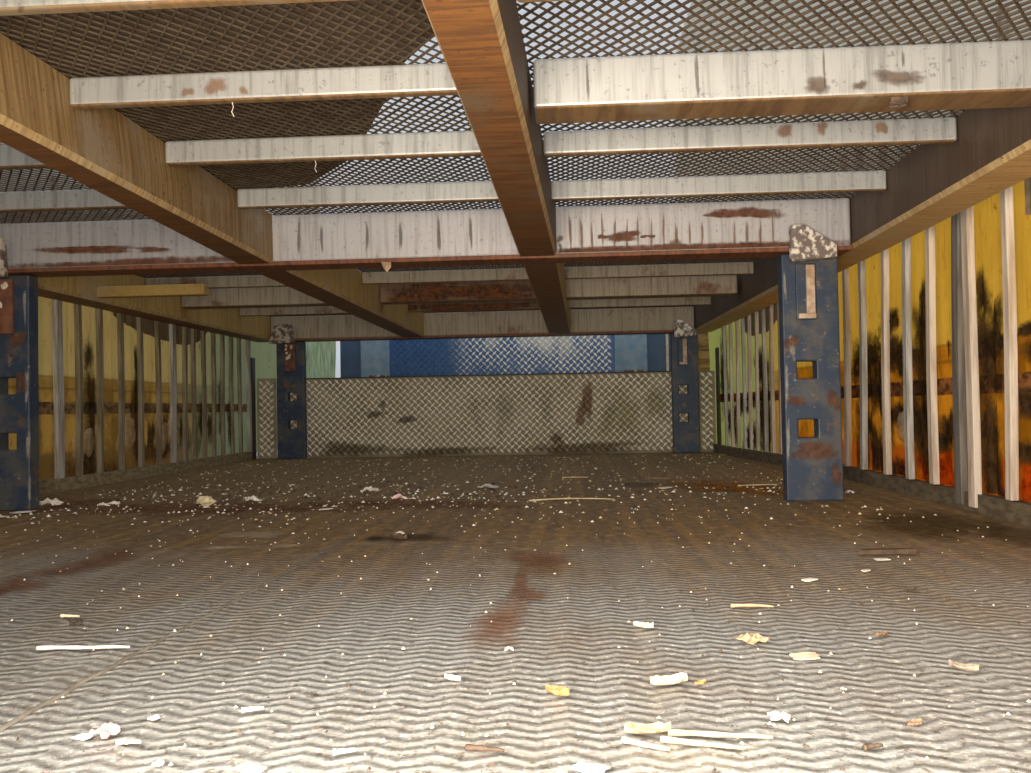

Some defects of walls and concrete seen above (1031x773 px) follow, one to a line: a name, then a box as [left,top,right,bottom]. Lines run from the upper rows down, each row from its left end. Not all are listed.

corrosion [558,207,789,253]
corrosion [12,246,231,268]
corrosion [393,282,533,311]
corrosion [794,444,841,483]